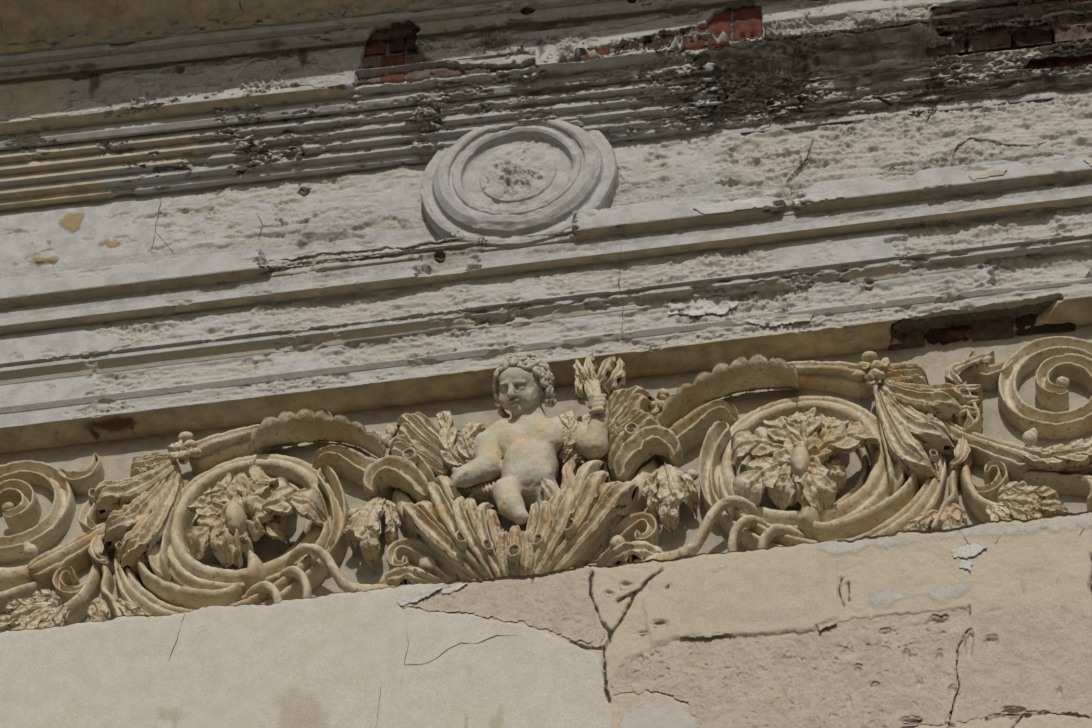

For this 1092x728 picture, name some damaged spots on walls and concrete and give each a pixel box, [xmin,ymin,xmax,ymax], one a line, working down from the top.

flaking render [354,20,537,88]
flaking render [558,6,763,63]
flaking render [926,0,1092,56]
flaking render [1019,54,1092,72]
flaking render [667,296,739,316]
flaking render [746,314,813,327]
flaking render [888,301,1075,350]
crack [573,570,661,701]
crack [375,631,507,728]
crack [948,608,971,728]